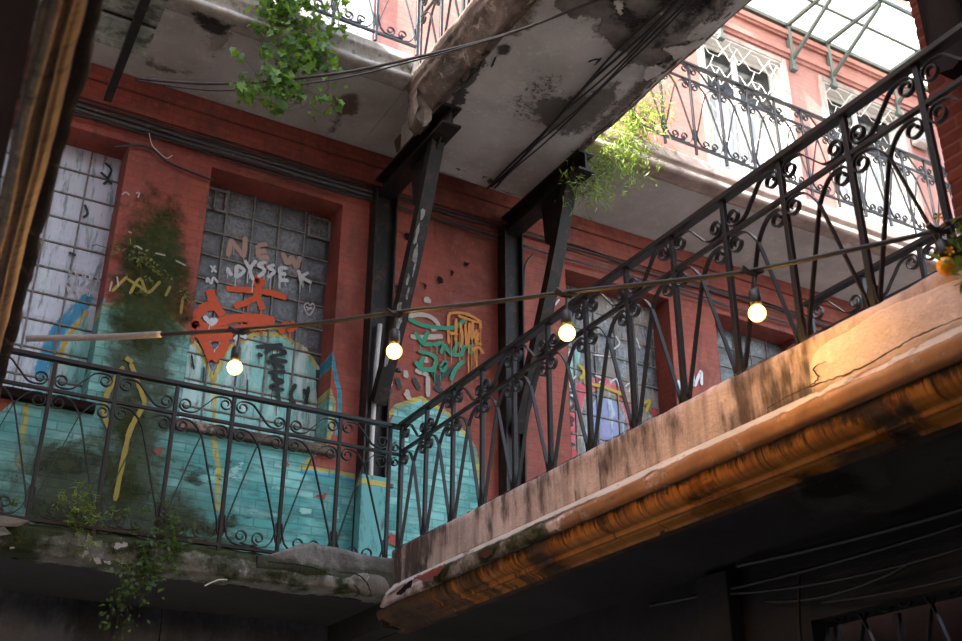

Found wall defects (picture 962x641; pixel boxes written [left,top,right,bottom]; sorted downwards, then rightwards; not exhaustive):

damp [191,12,233,58]
damp [451,0,540,106]
damp [514,0,733,153]
crack [766,317,962,409]
damp [385,326,962,594]